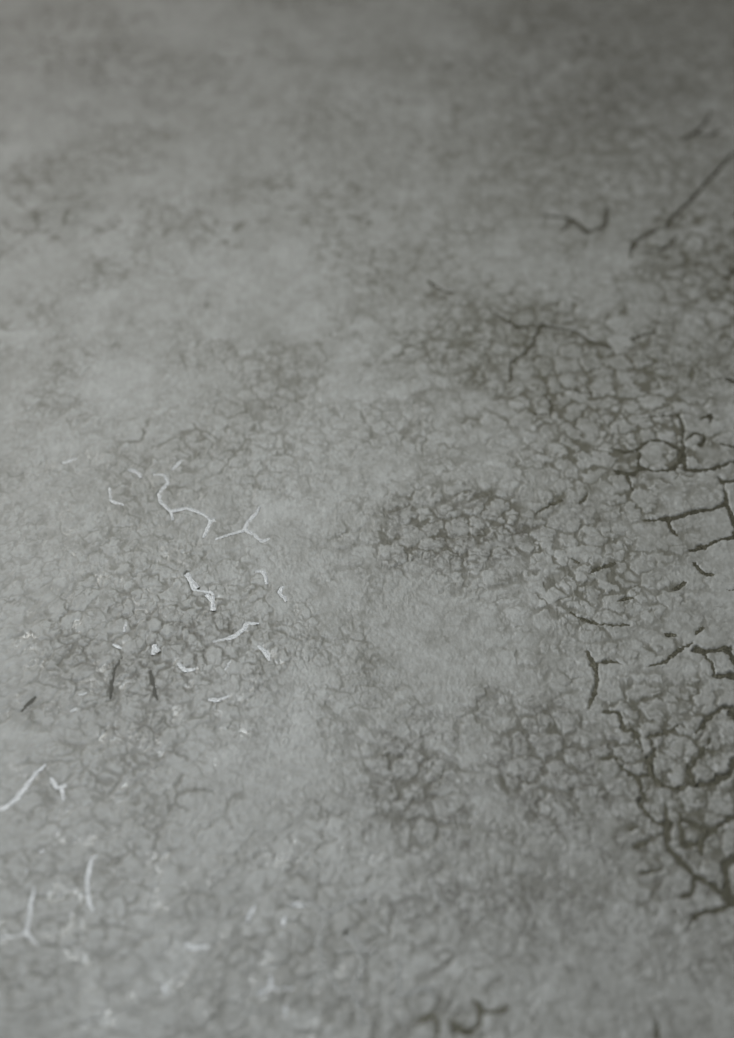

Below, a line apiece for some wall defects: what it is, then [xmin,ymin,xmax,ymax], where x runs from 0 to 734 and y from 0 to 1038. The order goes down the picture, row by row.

crack [108,460,270,543]
crack [536,493,588,515]
crack [613,413,734,591]
crack [184,572,216,611]
crack [573,559,616,574]
crack [570,597,634,627]
crack [70,622,127,712]
crack [149,644,196,701]
crack [208,622,271,702]
crack [648,626,734,680]
crack [585,650,734,931]
crack [412,1000,510,1038]